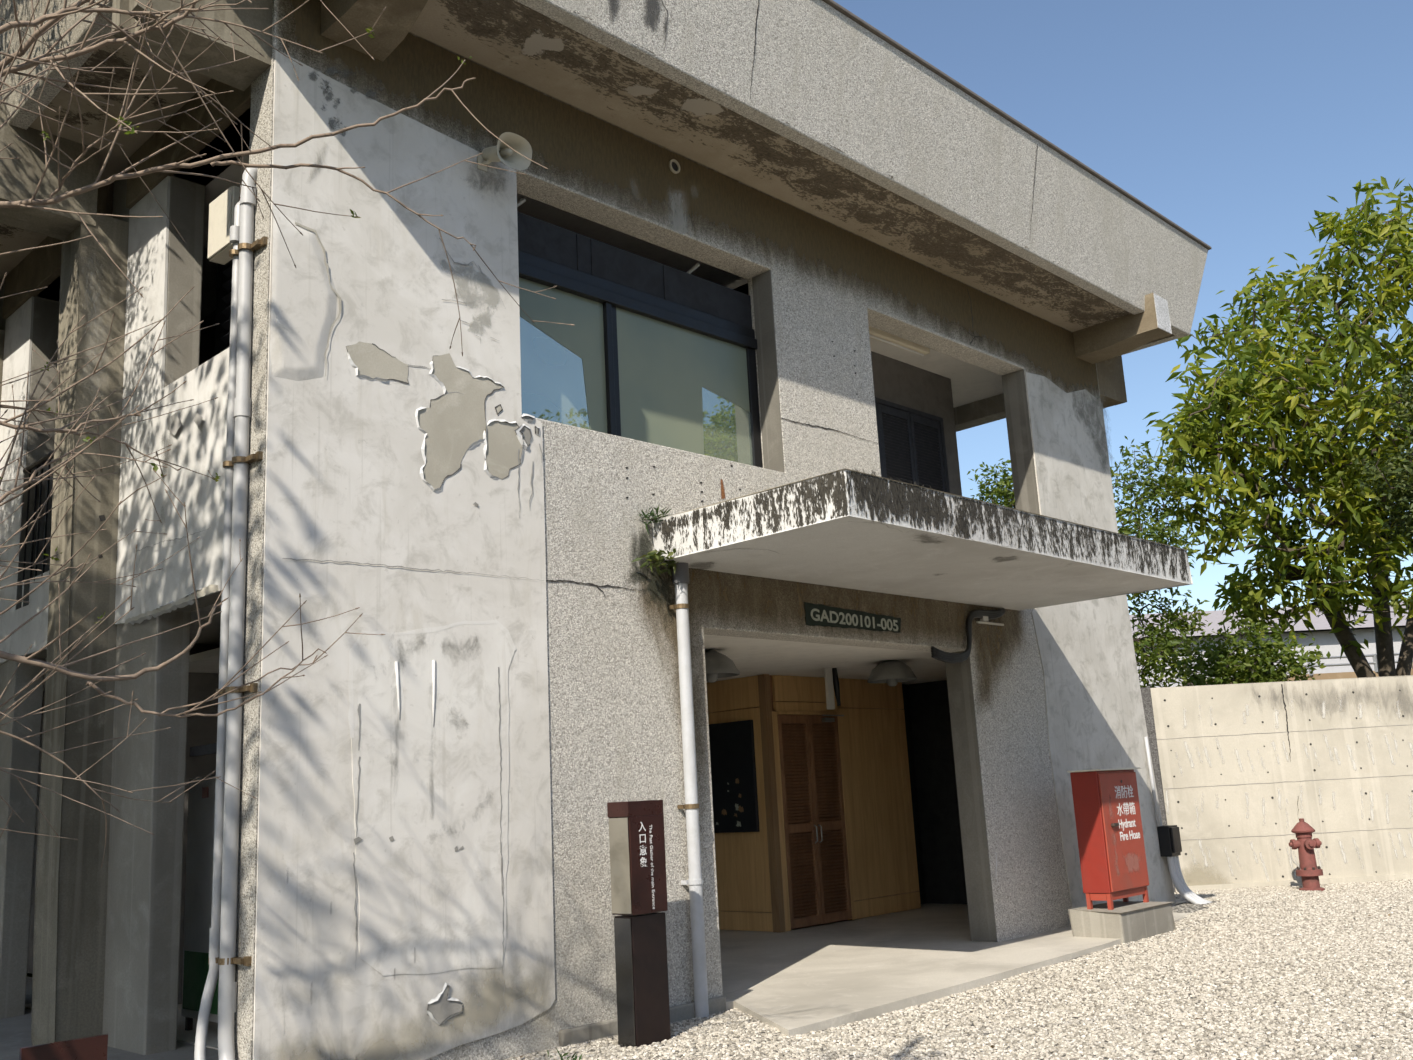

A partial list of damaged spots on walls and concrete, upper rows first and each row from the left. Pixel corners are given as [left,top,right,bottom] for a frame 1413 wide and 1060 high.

crack [750,0,759,99]
damp [280,0,1135,397]
peeling [346,341,540,492]
damp [643,469,1189,699]
damp [693,679,703,758]
peeling [427,982,463,1026]